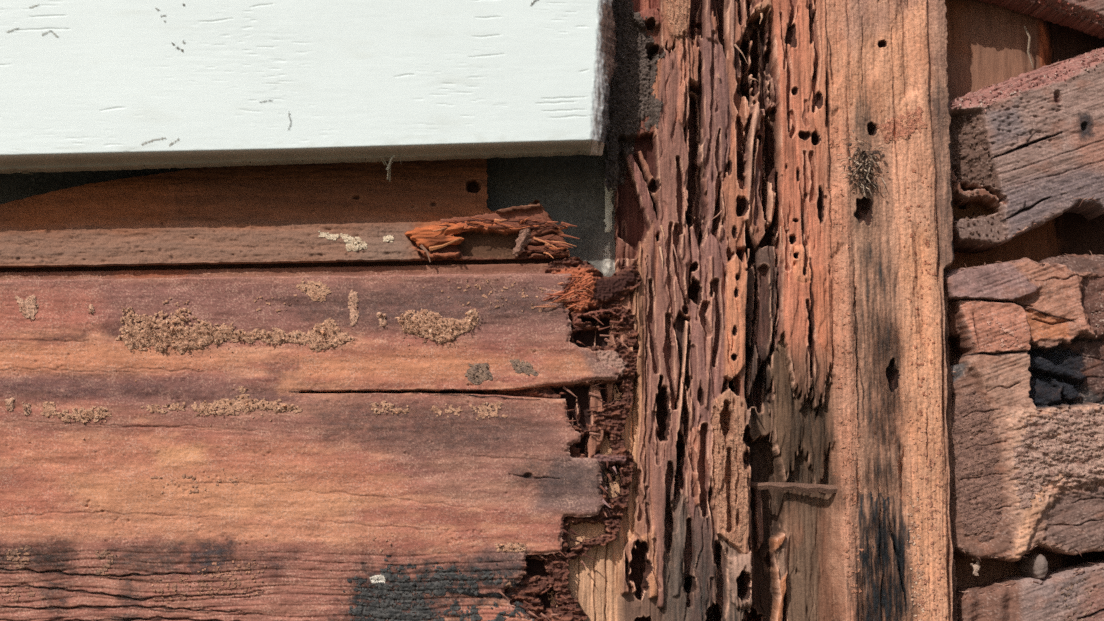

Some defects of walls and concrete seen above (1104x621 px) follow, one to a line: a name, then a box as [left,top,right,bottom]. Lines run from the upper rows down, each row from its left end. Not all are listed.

peeling [604,179,613,232]
peeling [383,222,464,249]
peeling [602,245,615,276]
peeling [509,359,538,376]
crack [289,389,540,400]
leakage [343,555,534,621]